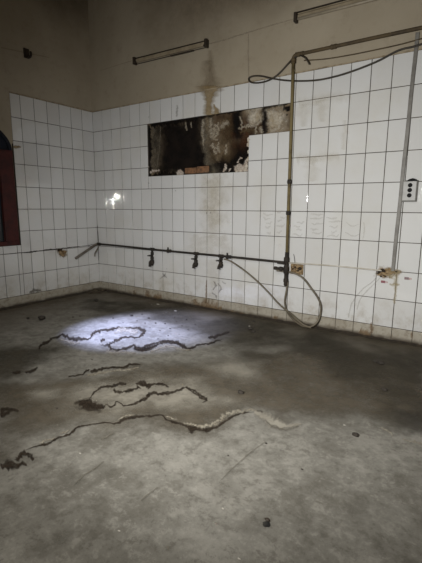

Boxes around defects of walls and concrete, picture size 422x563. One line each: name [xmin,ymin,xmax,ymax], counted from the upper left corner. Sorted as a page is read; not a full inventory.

water stain [202,85,219,115]
spalling [148,104,290,176]
spalling [377,268,401,278]
crack [39,326,229,377]
crack [0,407,19,417]